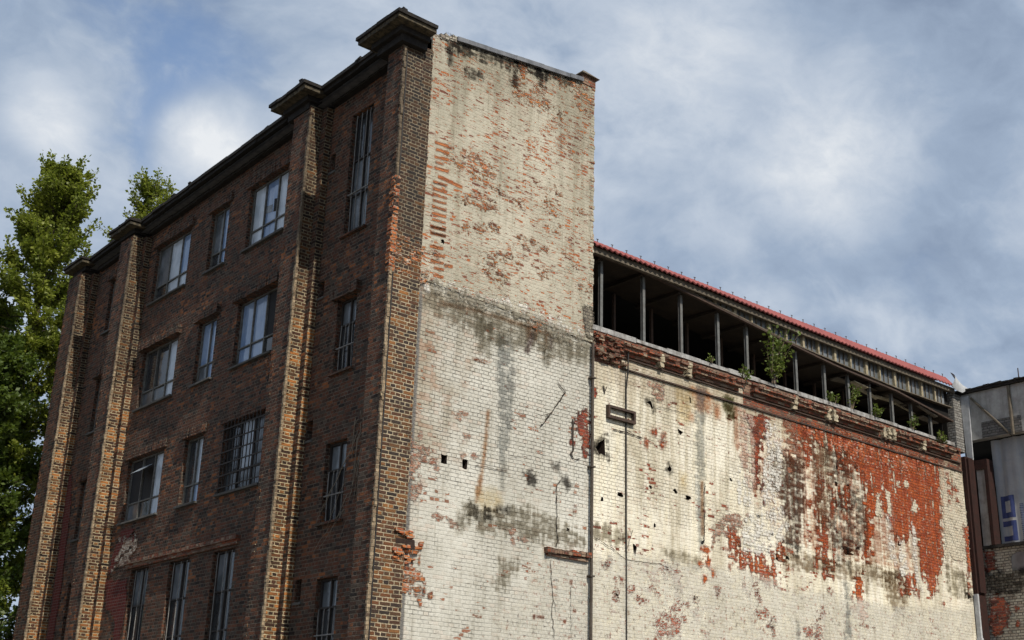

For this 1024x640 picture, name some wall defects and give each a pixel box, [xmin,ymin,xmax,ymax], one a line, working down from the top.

peeling [511,62,592,127]
spalling [384,141,549,301]
peeling [523,179,592,235]
spalling [569,408,610,461]
peeling [111,534,139,572]
spalling [392,527,433,607]
crack [540,380,580,636]
peeling [652,412,960,640]